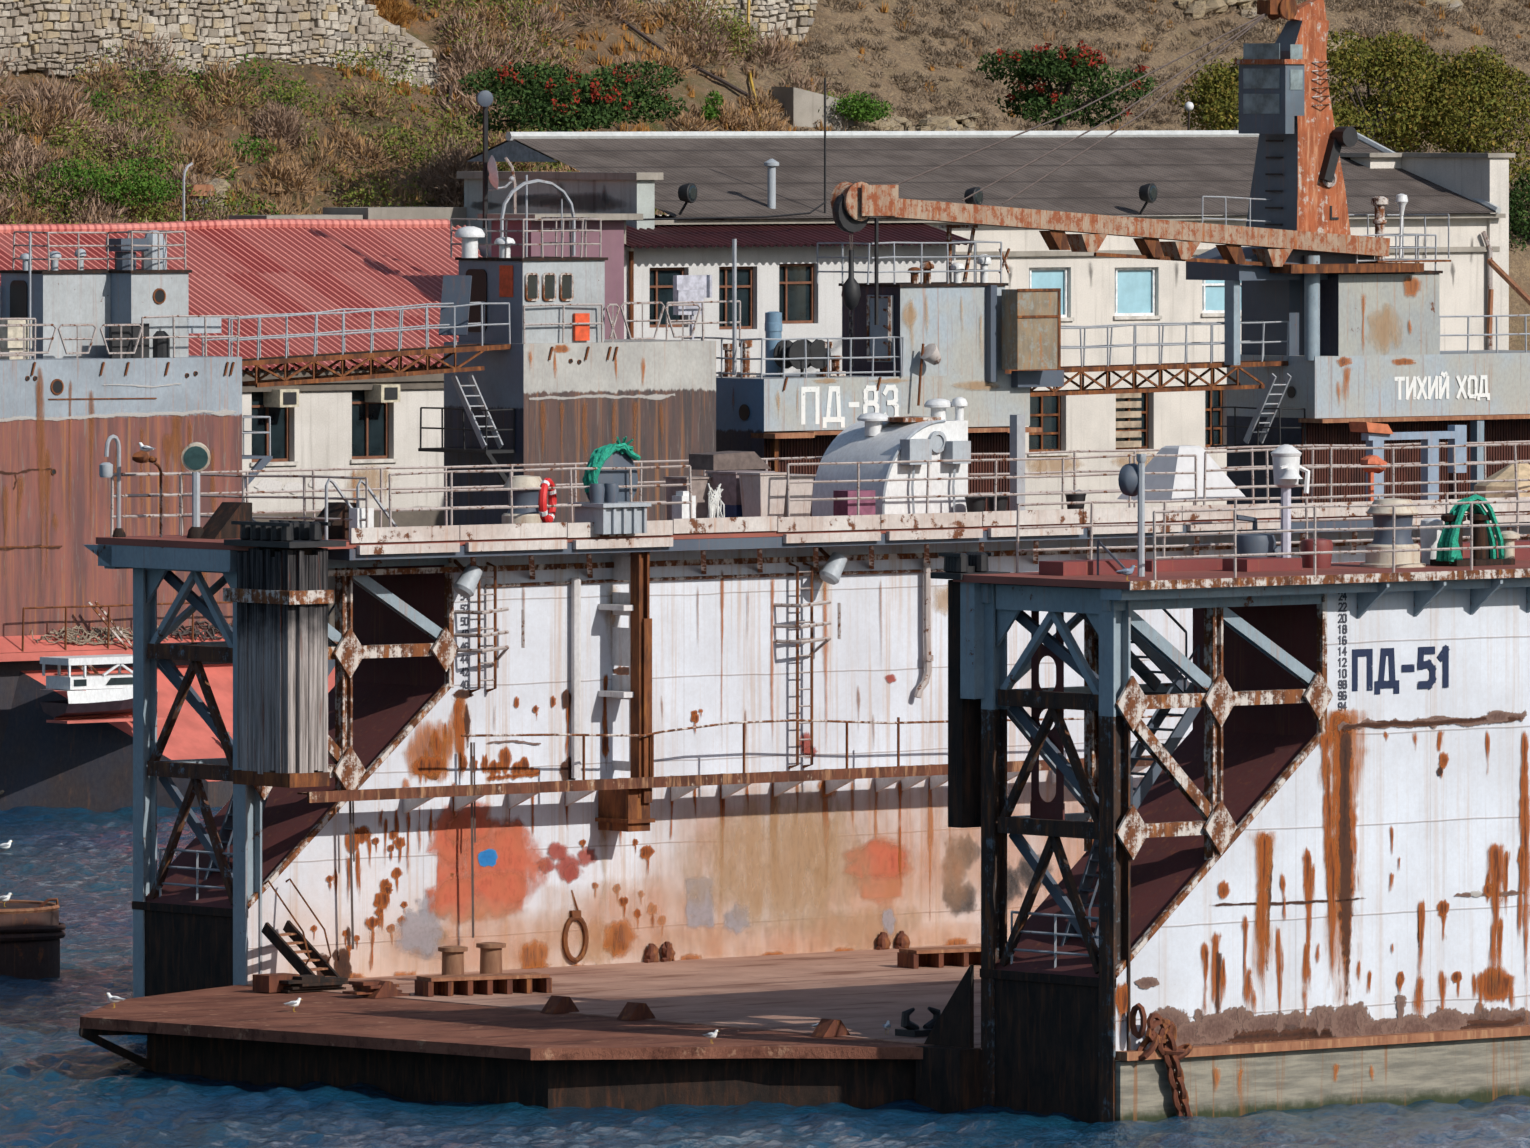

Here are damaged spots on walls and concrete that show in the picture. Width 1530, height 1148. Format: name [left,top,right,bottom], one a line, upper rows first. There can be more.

corrosion [403,689,541,819]
corrosion [514,689,576,781]
corrosion [691,709,703,734]
corrosion [311,808,432,978]
corrosion [514,940,548,969]
corrosion [592,882,666,957]
corrosion [620,831,655,871]
corrosion [1201,932,1226,1014]
corrosion [1242,832,1286,1011]
corrosion [1302,709,1372,1017]
corrosion [1390,826,1400,888]
corrosion [1397,731,1530,1017]